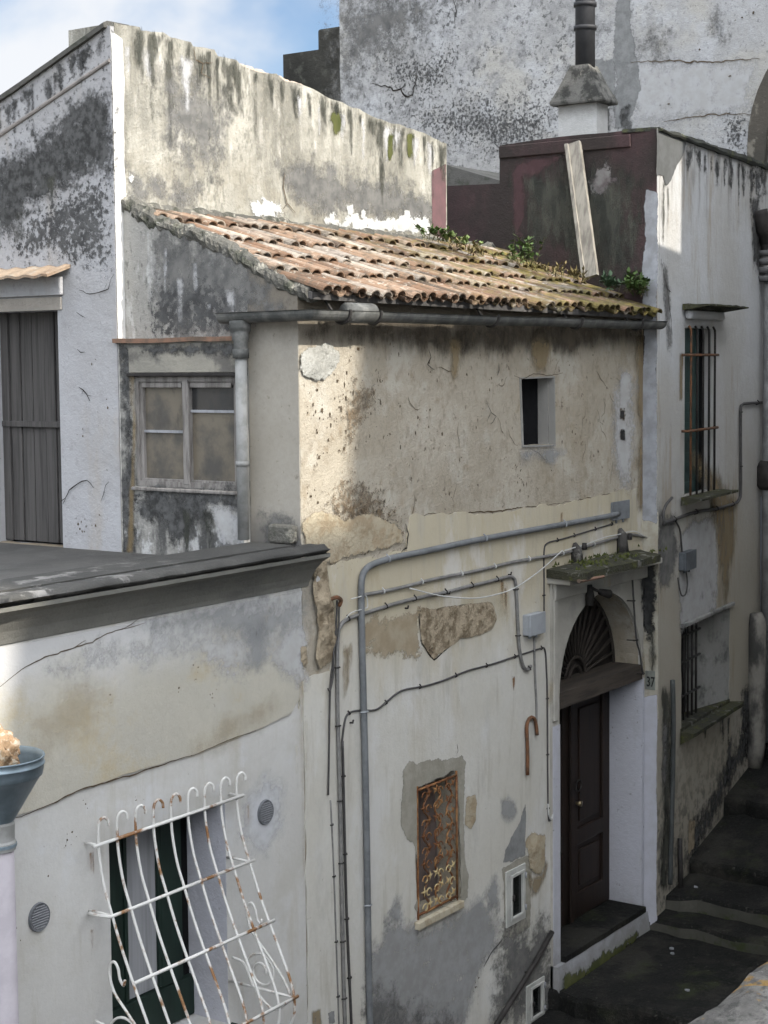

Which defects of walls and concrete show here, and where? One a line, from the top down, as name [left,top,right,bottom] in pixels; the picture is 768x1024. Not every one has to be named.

leakage [0,31,242,242]
peeling [250,196,283,218]
leakage [255,0,446,224]
peeling [324,204,430,235]
crack [372,68,418,98]
leakage [686,146,767,269]
mould [119,343,237,553]
flaking render [302,369,416,564]
leakage [359,323,643,508]
crack [0,617,146,687]
flaking render [365,602,497,659]
leakage [361,880,551,1024]